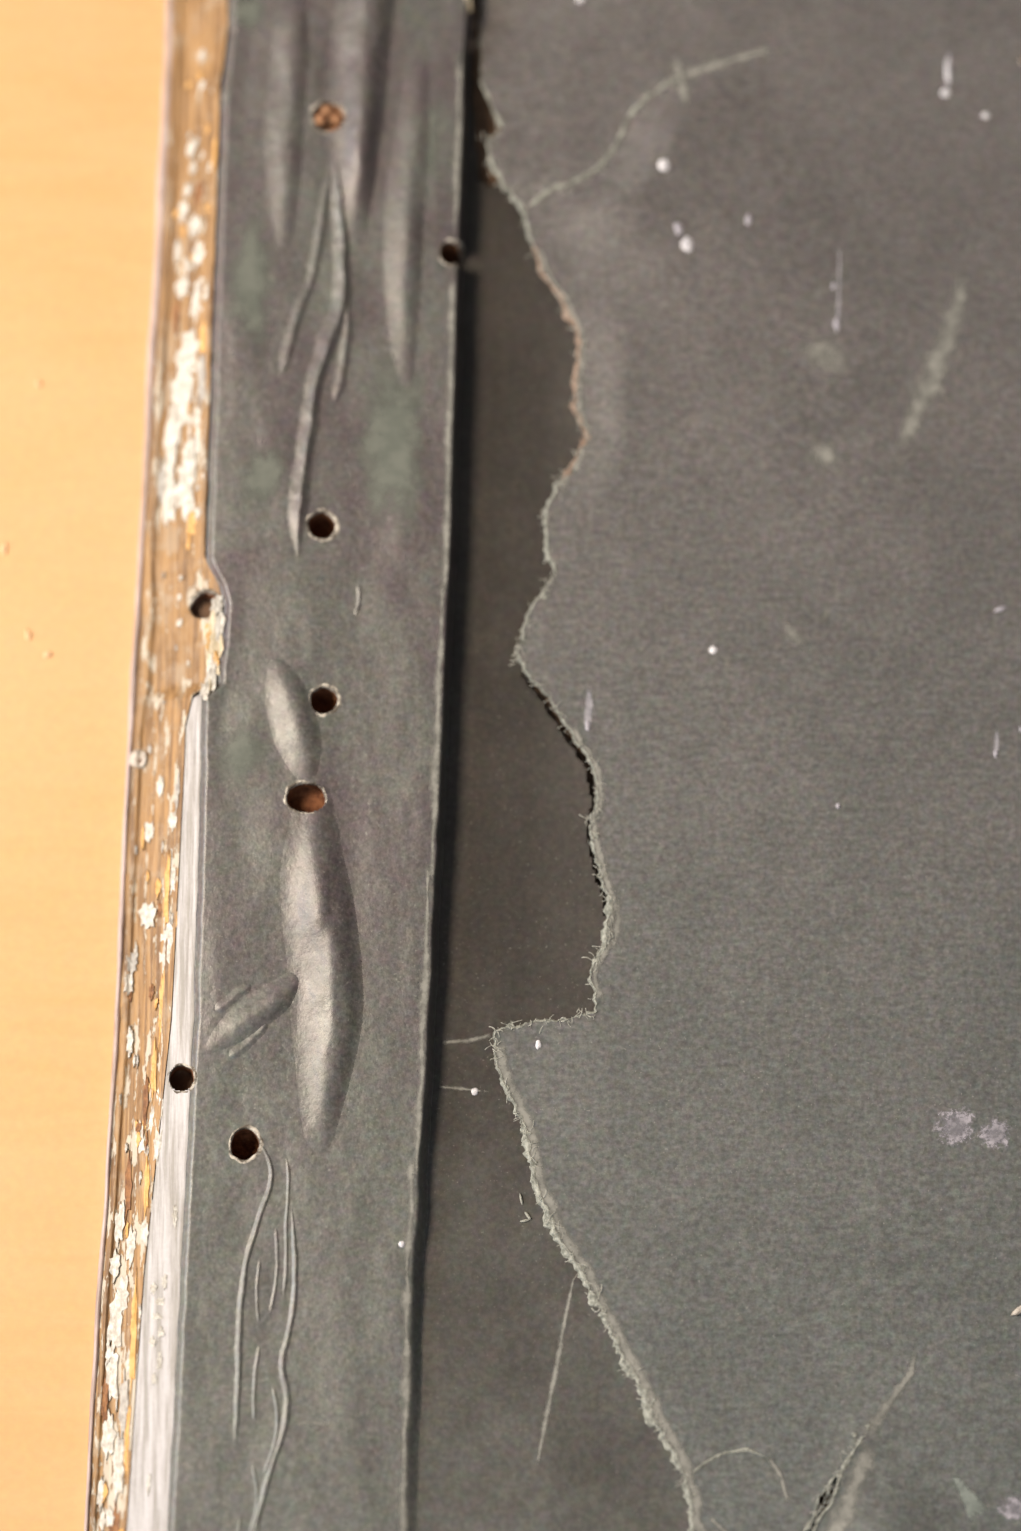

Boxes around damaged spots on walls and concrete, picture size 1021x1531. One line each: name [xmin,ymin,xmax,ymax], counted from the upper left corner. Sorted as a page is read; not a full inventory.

peeling [185,49,205,91]
peeling [158,123,217,552]
peeling [175,595,226,702]
peeling [97,773,180,1531]
damp [934,1109,1010,1148]
crack [693,1357,915,1531]
damp [997,1497,1021,1519]